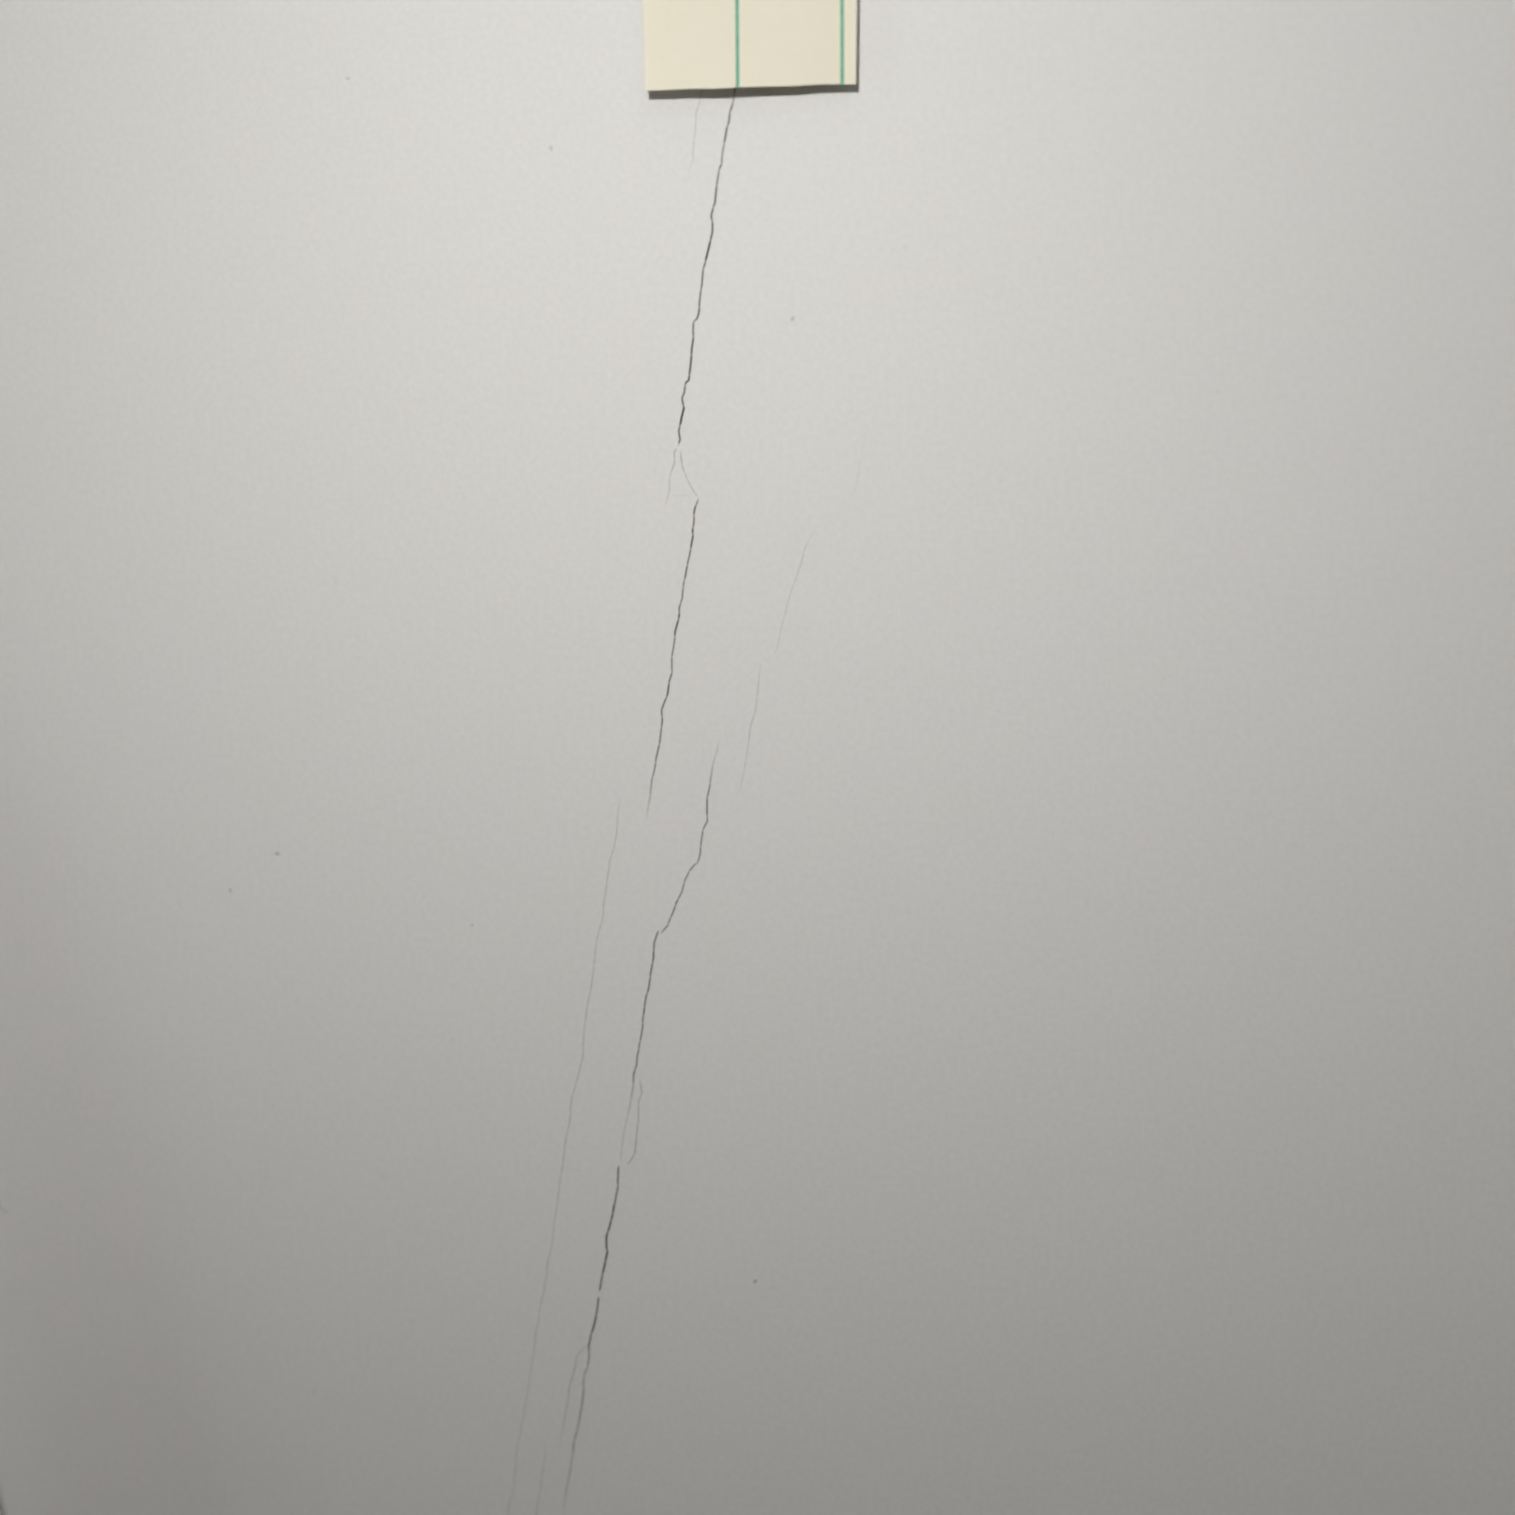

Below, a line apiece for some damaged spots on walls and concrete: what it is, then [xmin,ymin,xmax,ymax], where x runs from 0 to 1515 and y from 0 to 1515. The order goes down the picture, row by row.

crack [507,88,737,1515]
crack [559,524,818,1515]